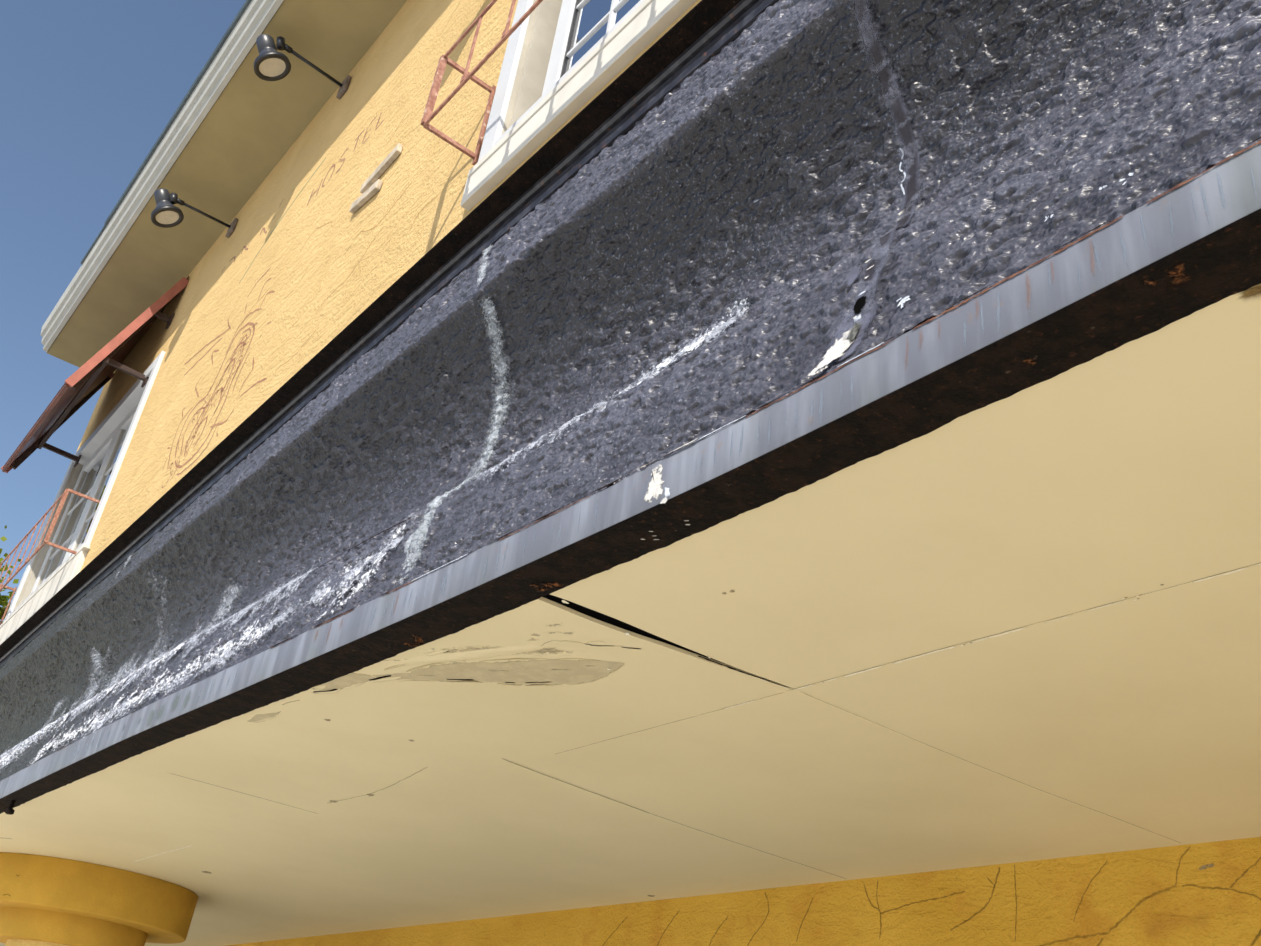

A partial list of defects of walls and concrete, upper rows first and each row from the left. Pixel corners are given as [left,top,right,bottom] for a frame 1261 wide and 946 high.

crack [664,0,1261,457]
spalling [808,291,877,378]
water stain [0,292,749,772]
crack [382,478,621,595]
spalling [628,464,670,504]
crack [271,607,355,648]
peeling [311,648,624,694]
crack [504,563,1261,946]